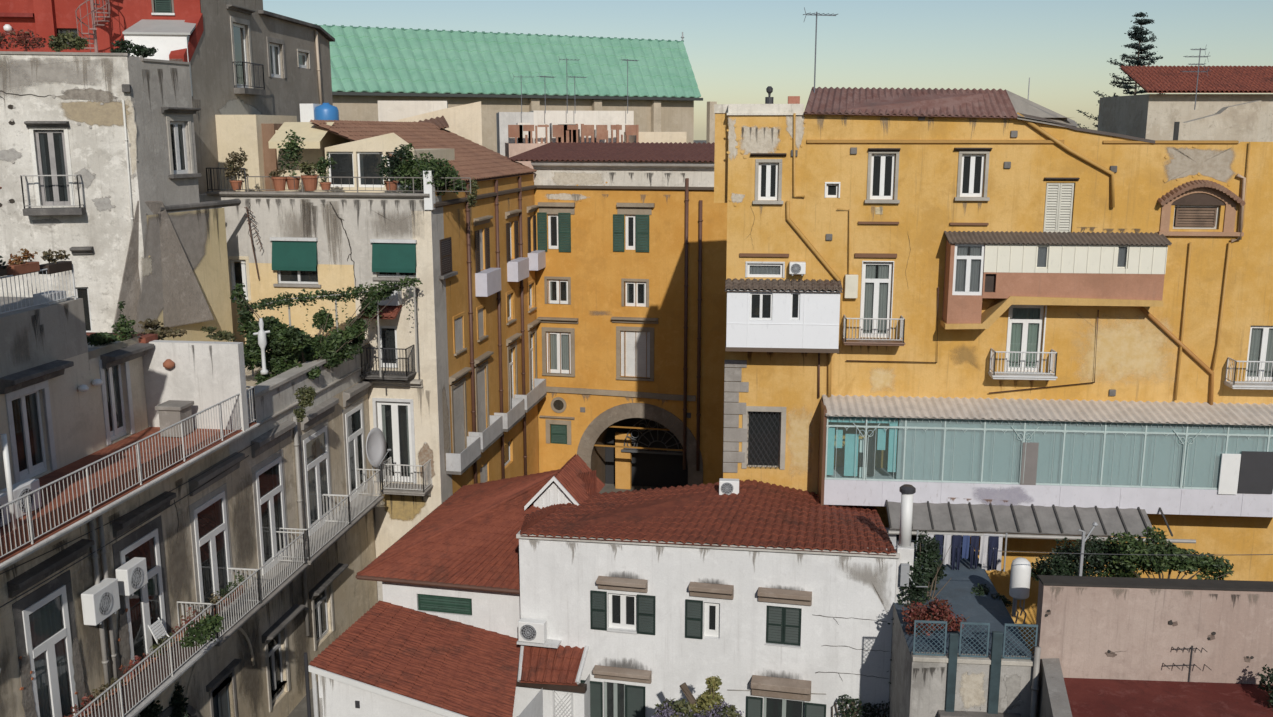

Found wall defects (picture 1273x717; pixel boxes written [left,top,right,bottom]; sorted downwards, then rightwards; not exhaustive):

water stain [0,59,98,97]
flaking render [51,87,138,178]
peeling [727,115,806,159]
flaking render [1163,145,1234,186]
water stain [237,199,325,238]
water stain [342,199,424,220]
water stain [951,488,1031,506]